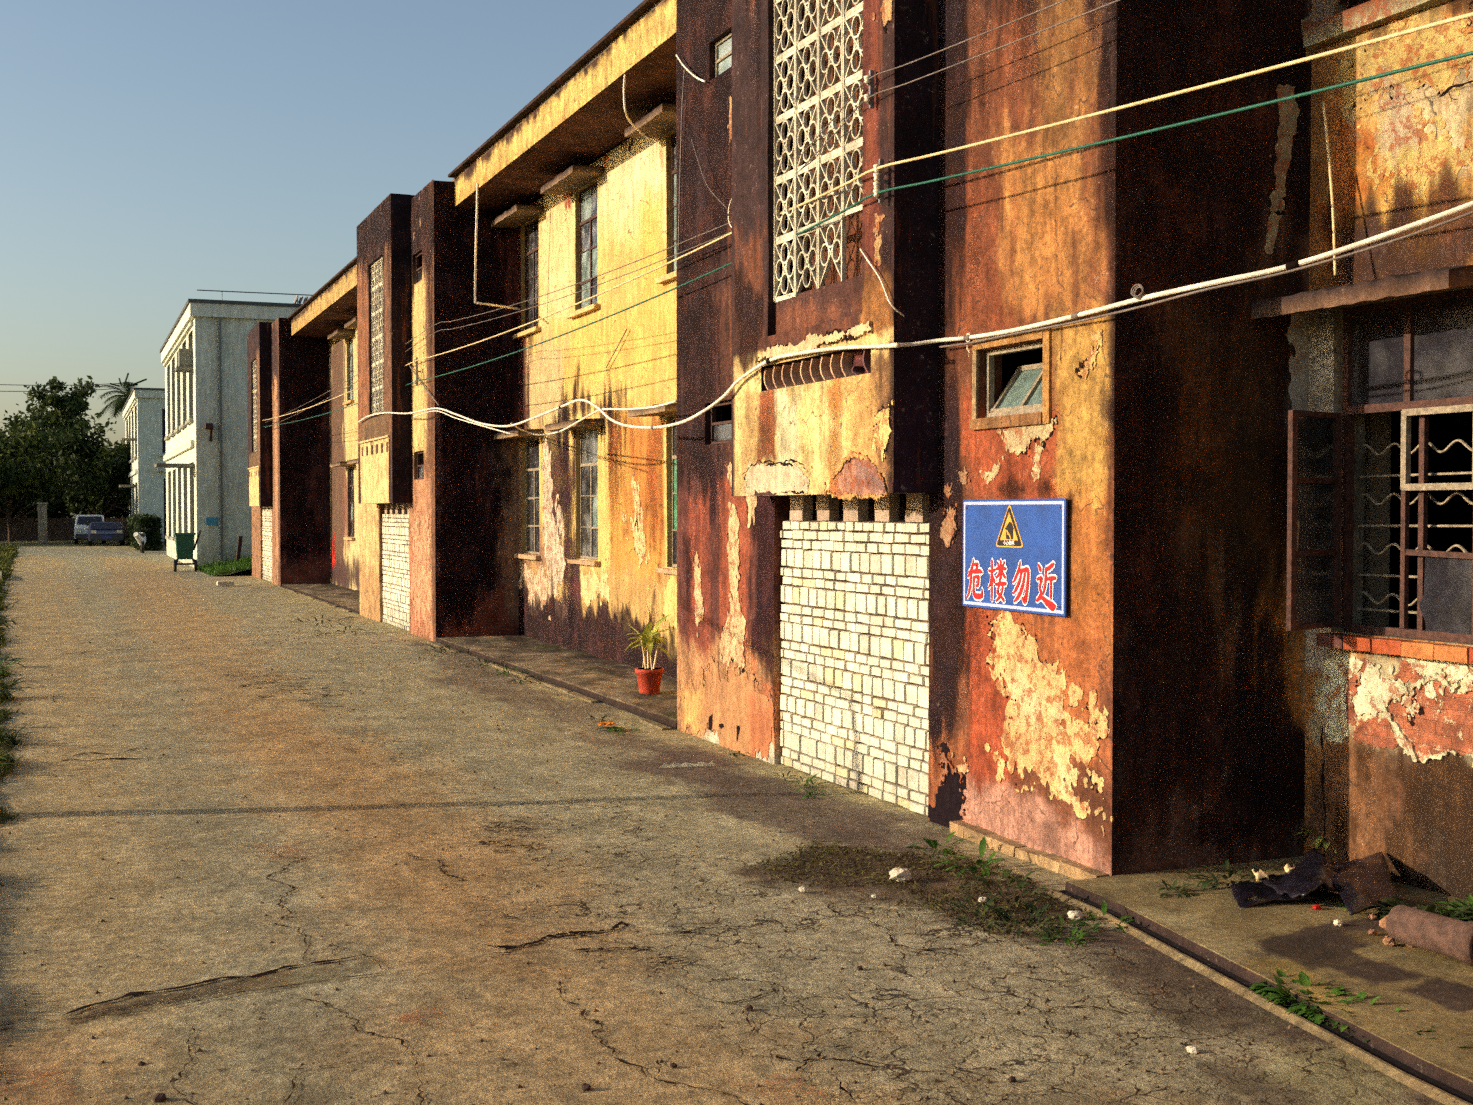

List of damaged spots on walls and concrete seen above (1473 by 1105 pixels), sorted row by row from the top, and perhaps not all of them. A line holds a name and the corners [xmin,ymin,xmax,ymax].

damp [410,181,677,678]
peeling [518,435,609,621]
damp [676,0,762,517]
peeling [676,398,895,760]
damp [928,0,971,749]
damp [1097,0,1473,854]
peeling [985,610,1113,837]
flaking render [1320,646,1473,770]
crack [0,850,428,1105]
crack [408,853,461,890]
crack [484,921,894,1105]
crack [804,902,1133,1038]